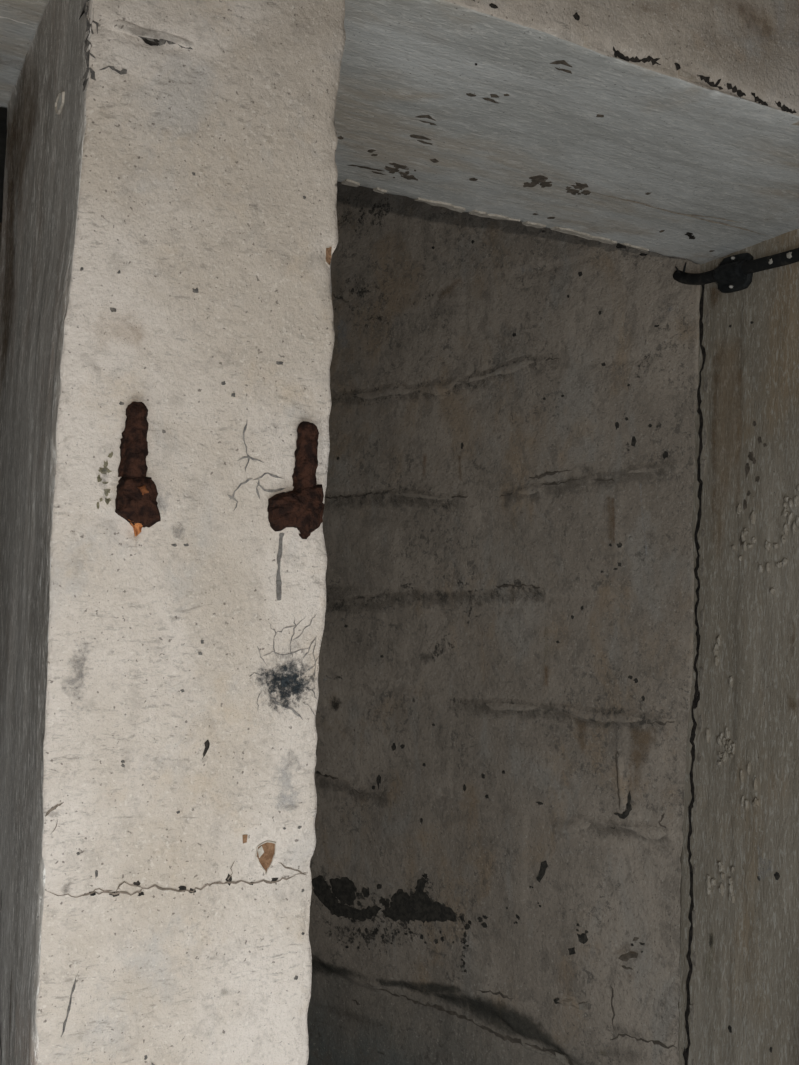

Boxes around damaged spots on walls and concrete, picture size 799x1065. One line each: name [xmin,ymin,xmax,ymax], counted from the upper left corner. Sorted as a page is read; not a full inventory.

corrosion [118,431,126,477]
crack [611,285,710,1065]
crack [45,861,305,898]
crack [353,985,574,1065]